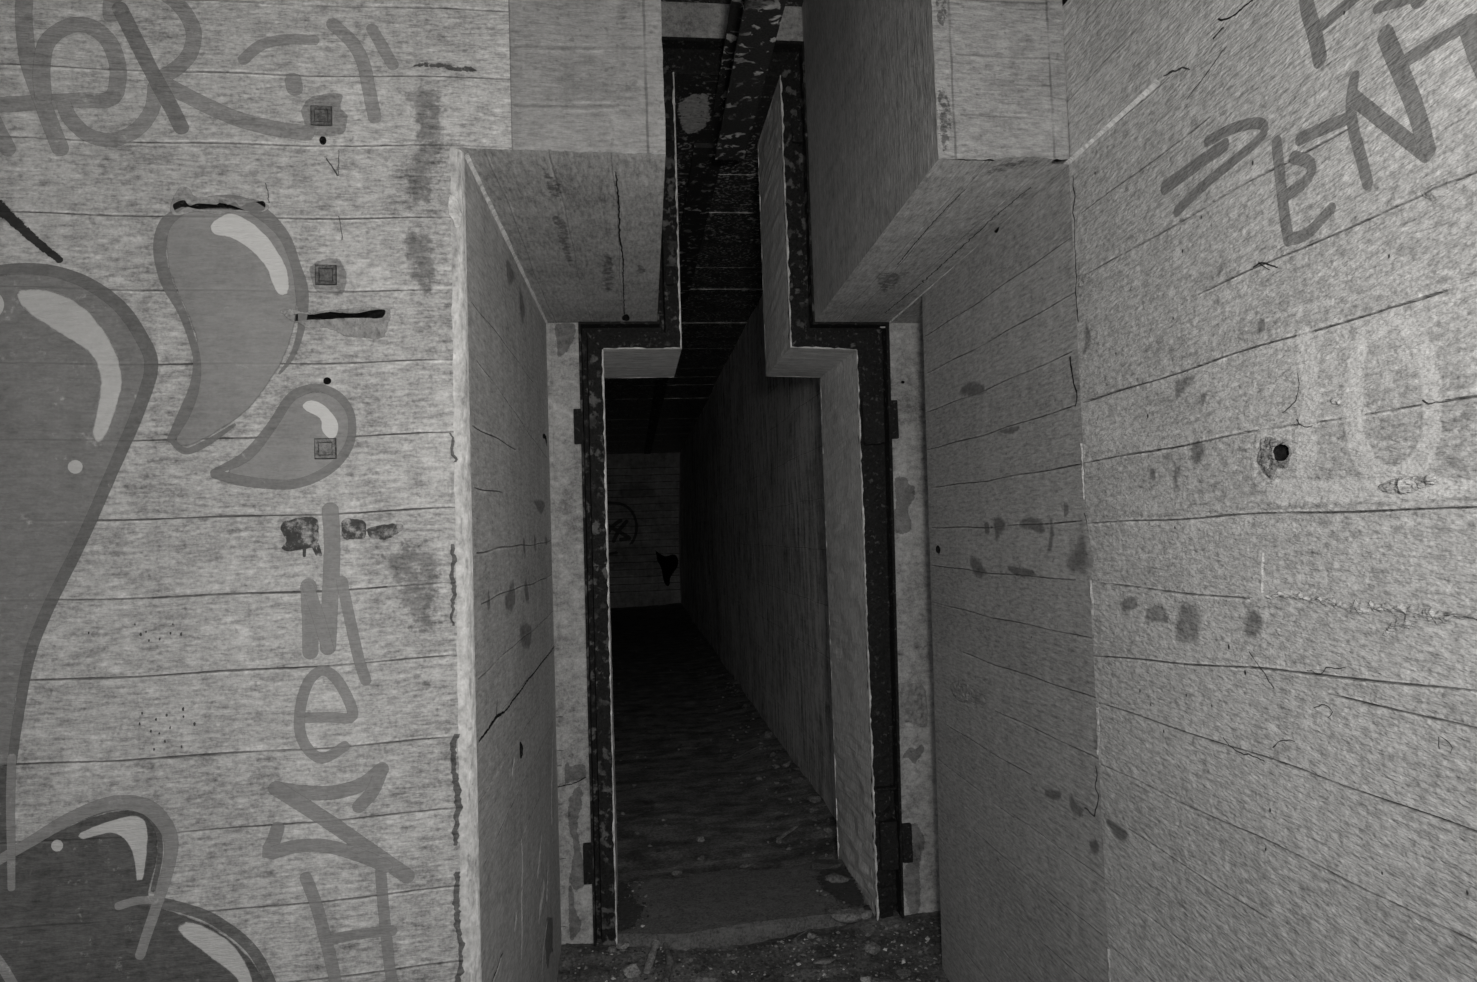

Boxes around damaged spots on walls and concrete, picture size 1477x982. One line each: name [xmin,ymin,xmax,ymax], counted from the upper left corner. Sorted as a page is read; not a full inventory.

water stain [398,61,477,296]
crack [614,171,625,314]
crack [479,647,554,742]